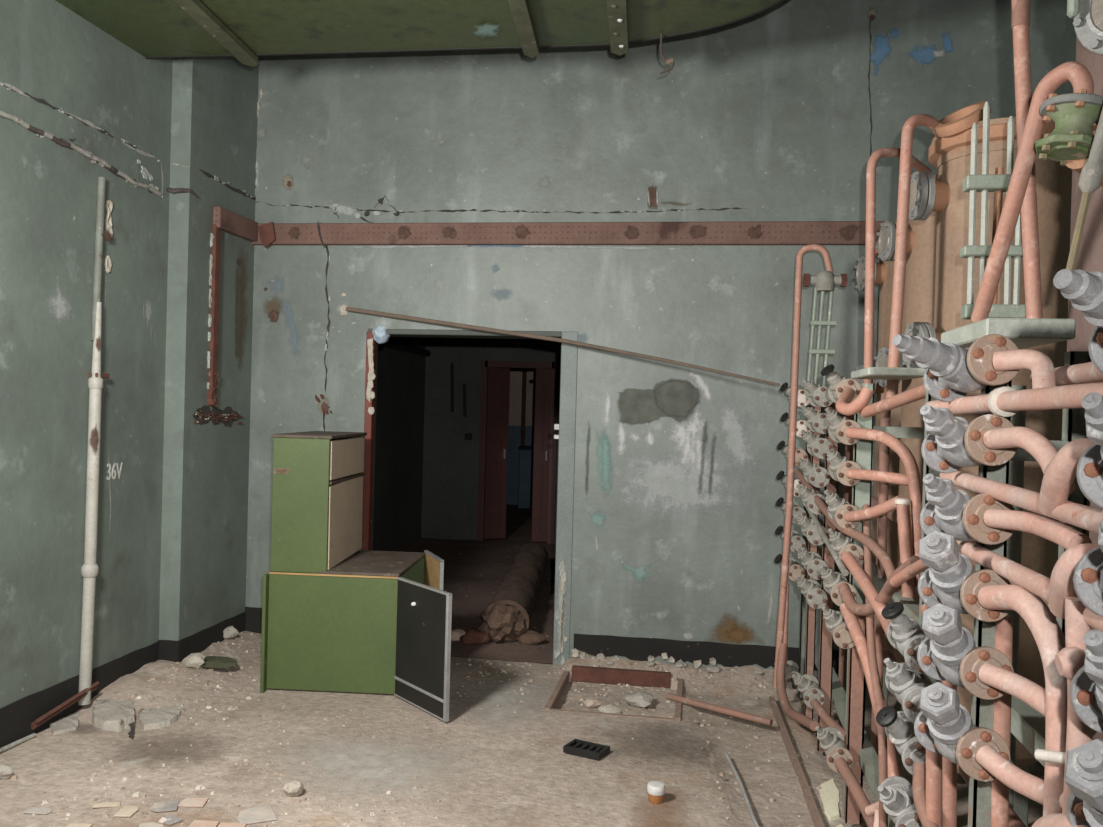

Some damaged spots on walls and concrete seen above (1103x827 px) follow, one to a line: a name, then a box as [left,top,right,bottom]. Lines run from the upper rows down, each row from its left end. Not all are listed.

crack [0,82,745,431]
crack [866,19,874,156]